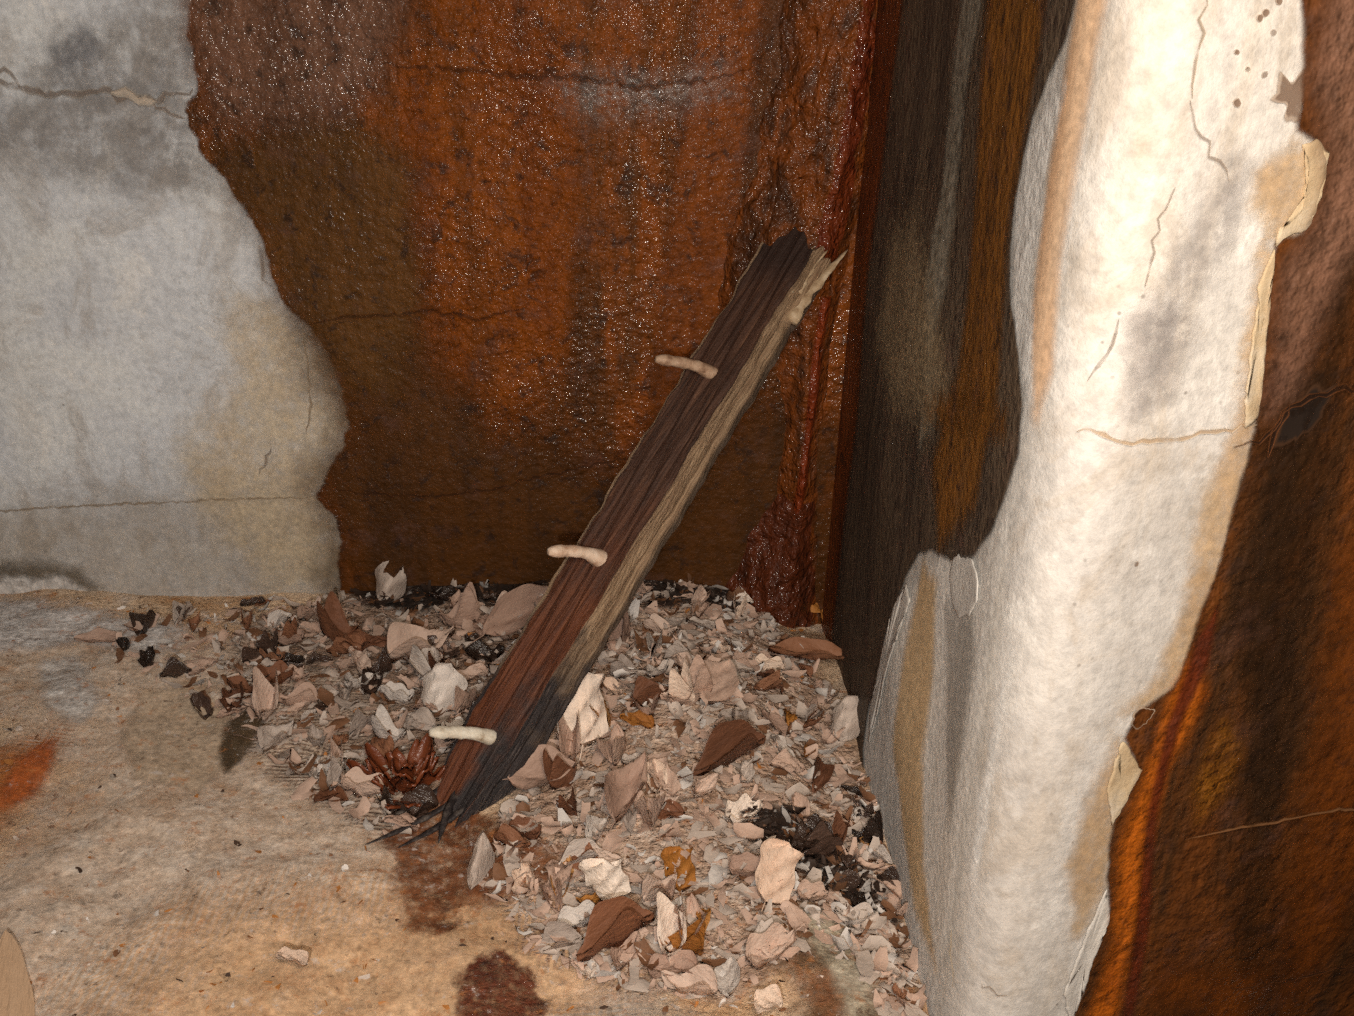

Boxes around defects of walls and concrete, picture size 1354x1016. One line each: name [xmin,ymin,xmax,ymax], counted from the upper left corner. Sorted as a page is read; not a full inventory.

spalling [1257,0,1283,34]
crack [110,87,157,106]
spalling [1234,49,1304,122]
corrosion [185,0,786,594]
peeling [1244,139,1330,428]
corrosion [814,217,858,624]
crack [1077,389,1352,458]
corrosion [1075,0,1354,1016]
peeling [868,584,910,742]
corrosion [0,736,57,814]
peeling [1107,742,1143,825]
peeling [1063,889,1111,1016]